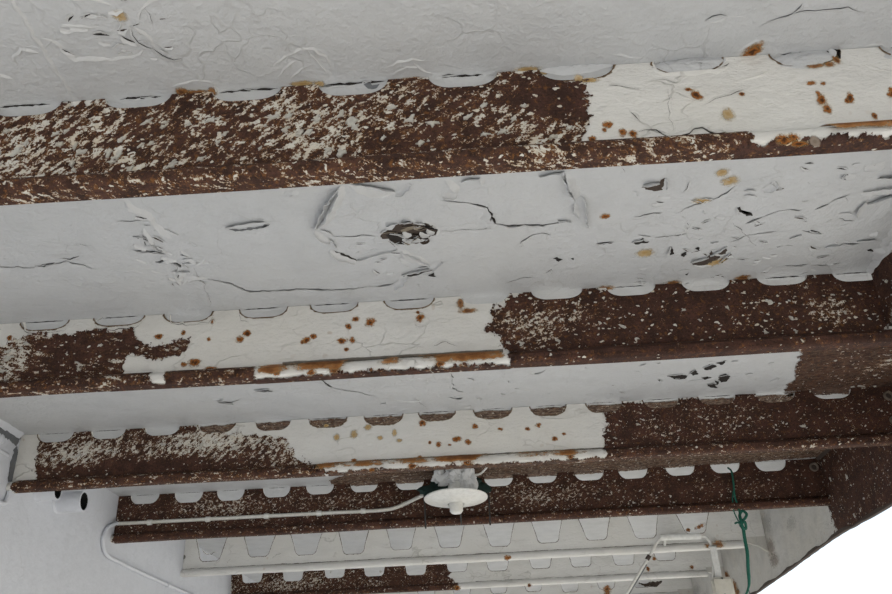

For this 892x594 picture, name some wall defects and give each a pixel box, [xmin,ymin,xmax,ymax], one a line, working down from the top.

crack [705,4,865,27]
rust [807,56,840,68]
rust [0,67,892,206]
crack [0,244,96,270]
peeling [313,183,443,290]
crack [441,201,571,248]
peeling [633,178,670,207]
peeling [667,198,818,285]
peeling [725,181,784,227]
rust [0,251,892,544]
peeling [657,361,738,388]
rust [231,564,461,594]